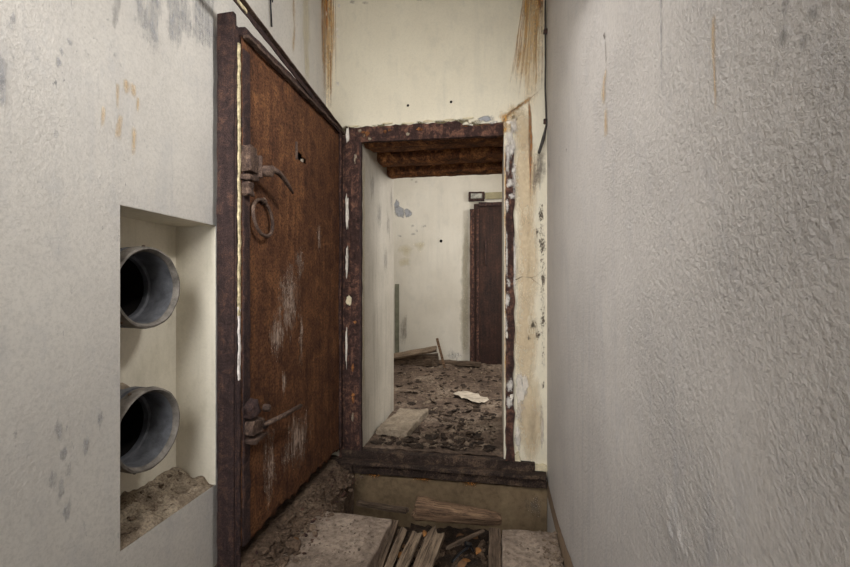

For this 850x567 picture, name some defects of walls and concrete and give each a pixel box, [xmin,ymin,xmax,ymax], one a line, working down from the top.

rust [321,0,336,93]
peeling [394,200,412,217]
peeling [372,116,534,209]
peeling [505,229,535,305]
water stain [536,208,546,294]
peeling [507,308,544,462]